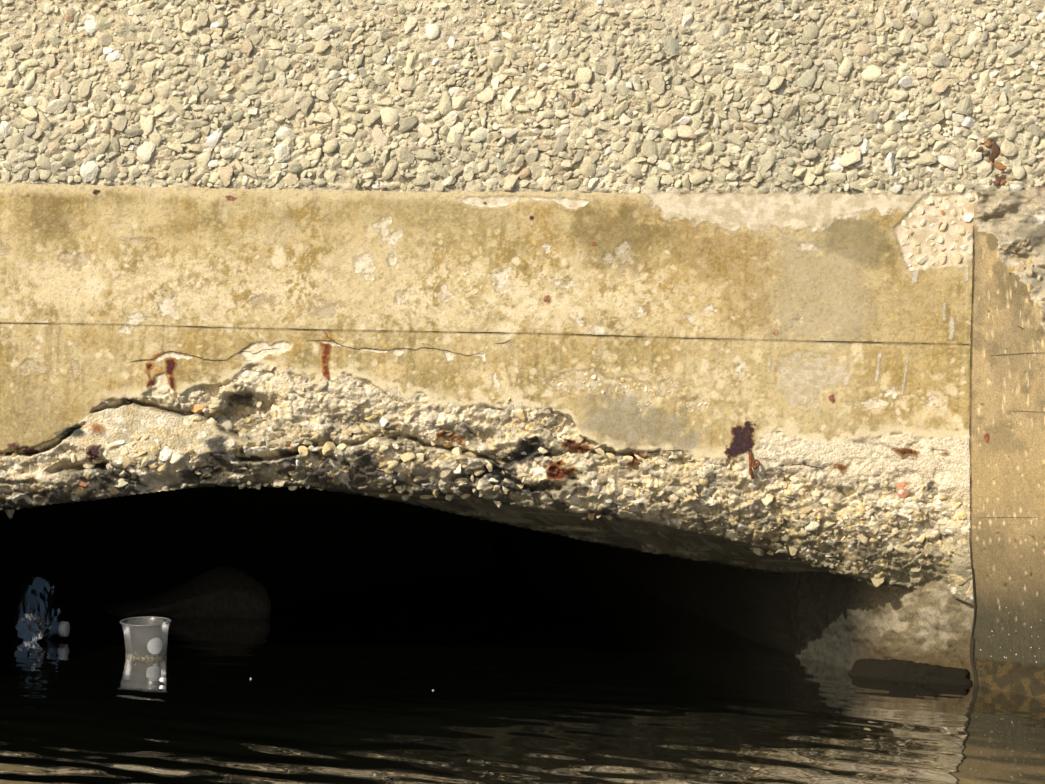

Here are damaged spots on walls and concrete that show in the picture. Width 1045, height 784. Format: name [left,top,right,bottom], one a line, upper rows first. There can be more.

peeling [642,187,978,271]
rust [146,351,177,391]
crack [128,328,275,381]
rust [320,331,335,379]
crack [294,328,511,356]
crack [572,331,642,339]
crack [815,338,883,346]
rust [724,421,756,458]
spalling [0,341,974,606]